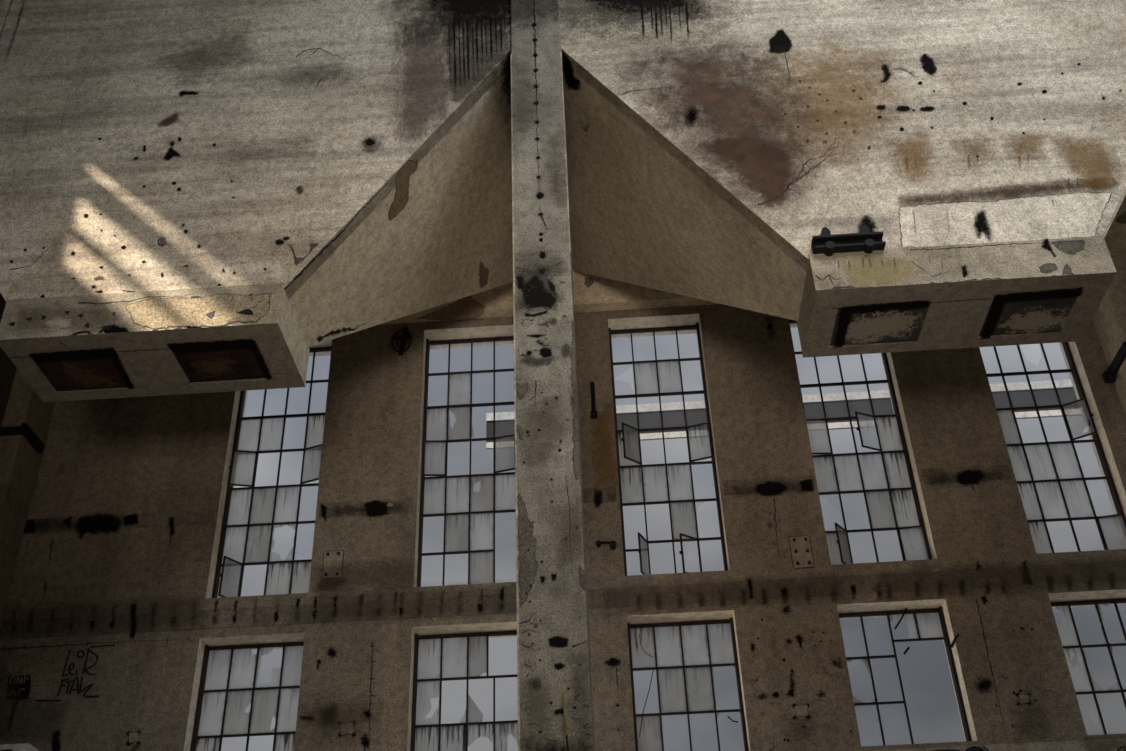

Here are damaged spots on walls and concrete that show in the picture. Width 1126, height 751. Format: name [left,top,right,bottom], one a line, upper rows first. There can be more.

damp [402,17,502,139]
damp [625,45,814,204]
peeling [388,160,418,220]
crack [758,135,840,209]
spalling [9,311,89,328]
spalling [113,268,272,329]
peeling [517,493,557,607]